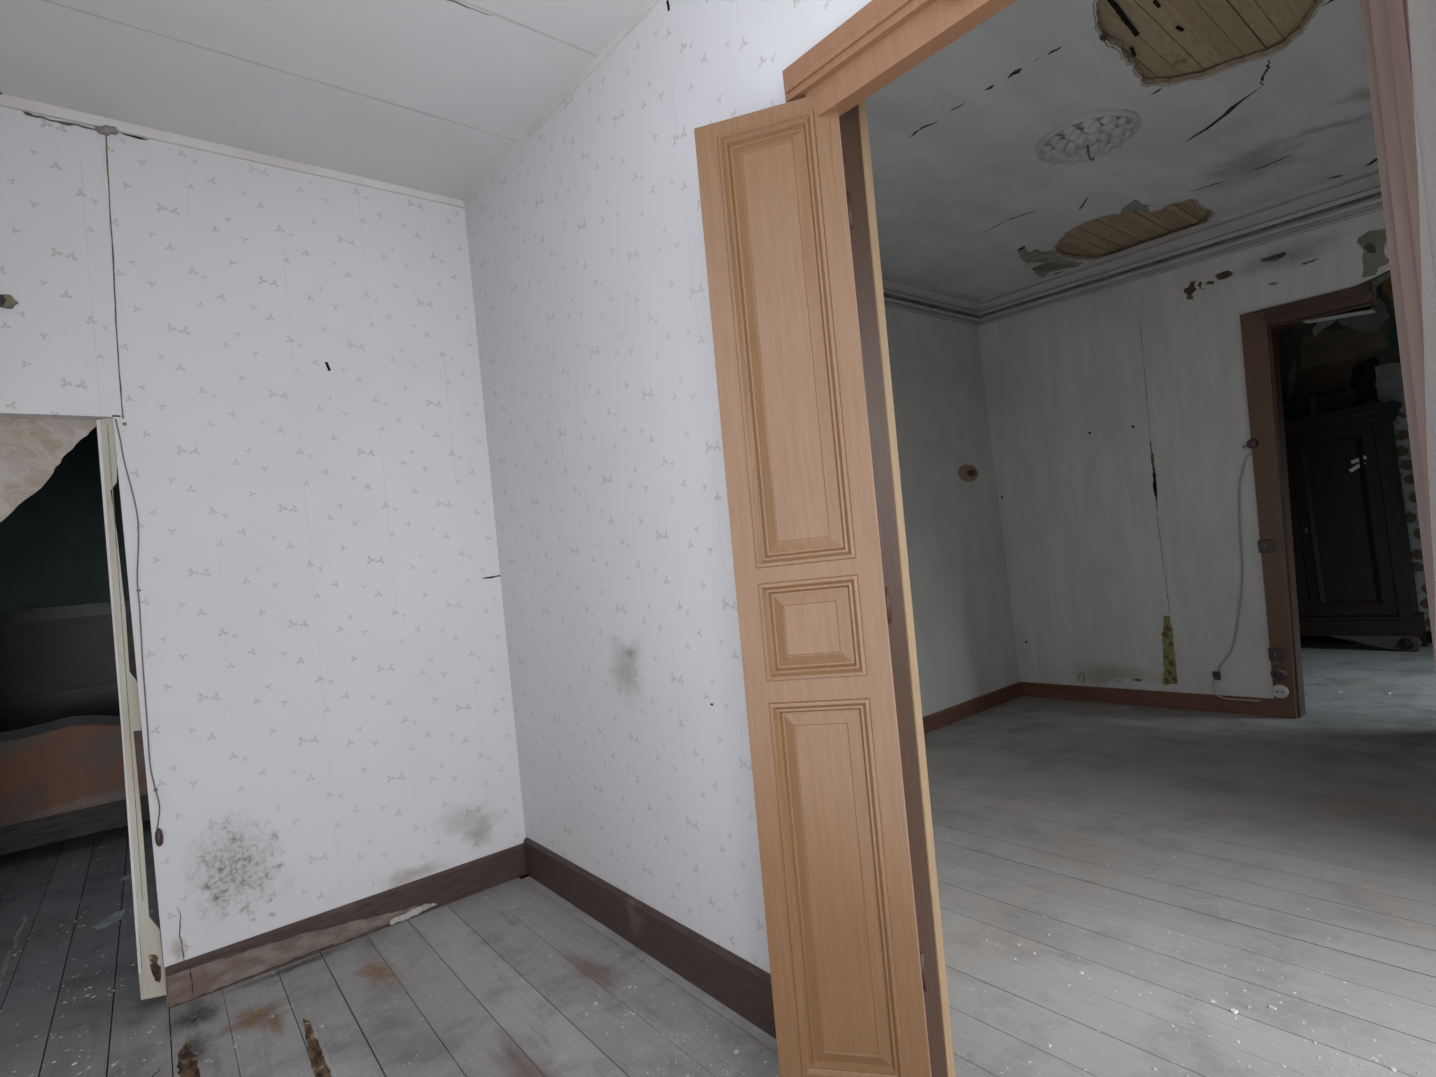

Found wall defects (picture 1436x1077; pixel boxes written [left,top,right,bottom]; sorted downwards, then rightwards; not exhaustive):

spalling [1093,0,1326,87]
crack [1187,58,1271,141]
flaking render [1017,245,1083,278]
peeling [1184,270,1233,299]
flaking render [1357,229,1395,310]